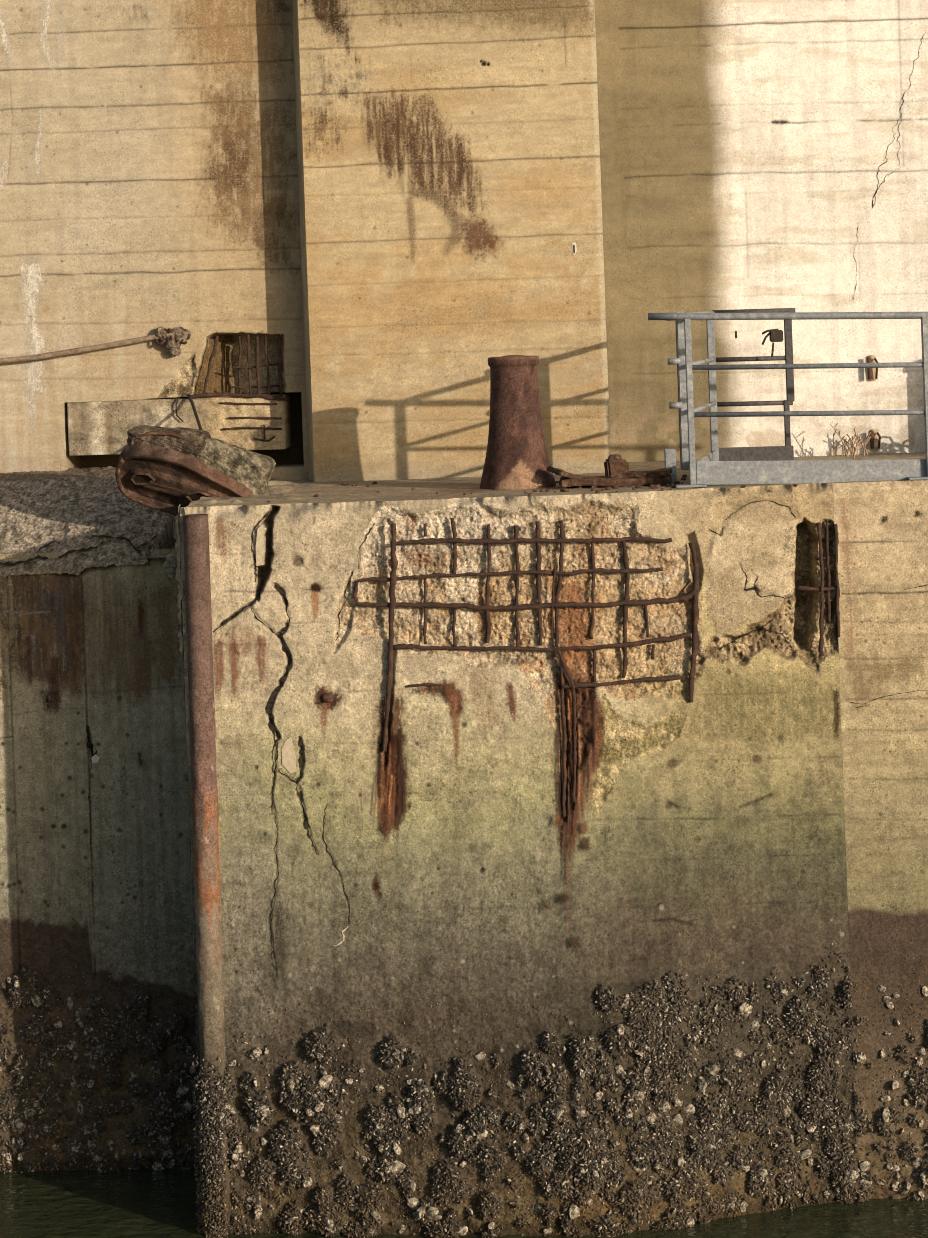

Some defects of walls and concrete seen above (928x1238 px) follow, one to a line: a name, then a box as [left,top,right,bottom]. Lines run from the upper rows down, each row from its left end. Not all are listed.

leakage [177,0,350,268]
crack [853,35,924,300]
rust [0,571,85,712]
crack [0,535,158,566]
crack [213,505,350,976]
rust [374,680,464,840]
rust [543,579,604,948]
spalling [332,498,840,818]